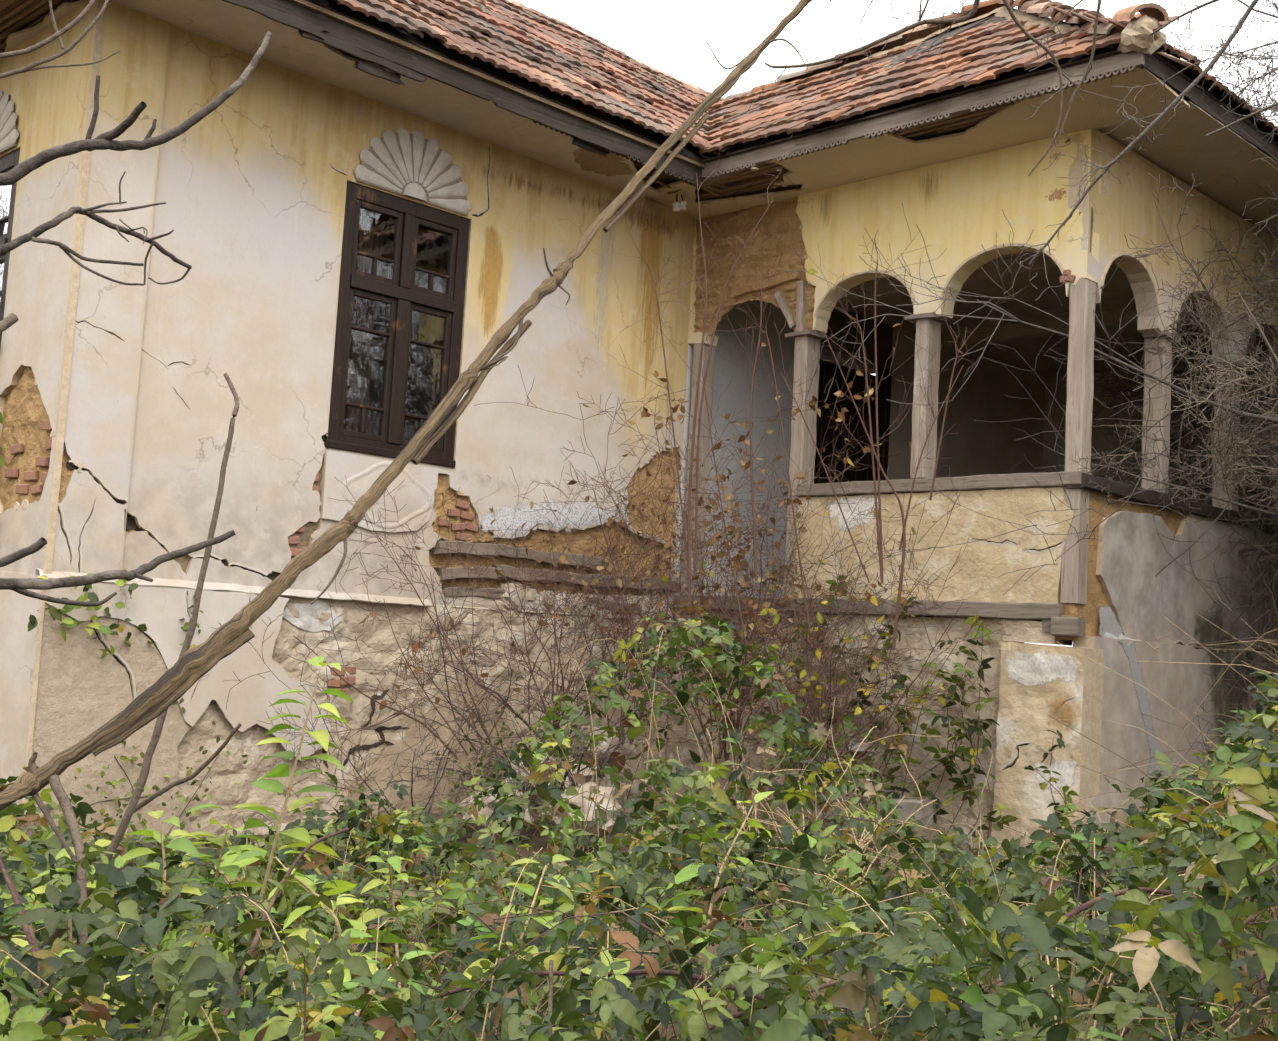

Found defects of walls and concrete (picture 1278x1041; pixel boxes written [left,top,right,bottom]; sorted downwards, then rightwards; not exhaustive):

flaking render [644,162,818,337]
flaking render [0,366,83,512]
crack [57,460,128,573]
crack [148,529,267,602]
leakage [479,499,620,536]
crack [298,689,408,768]
flaking render [177,447,677,838]
flaking render [1099,606,1167,786]